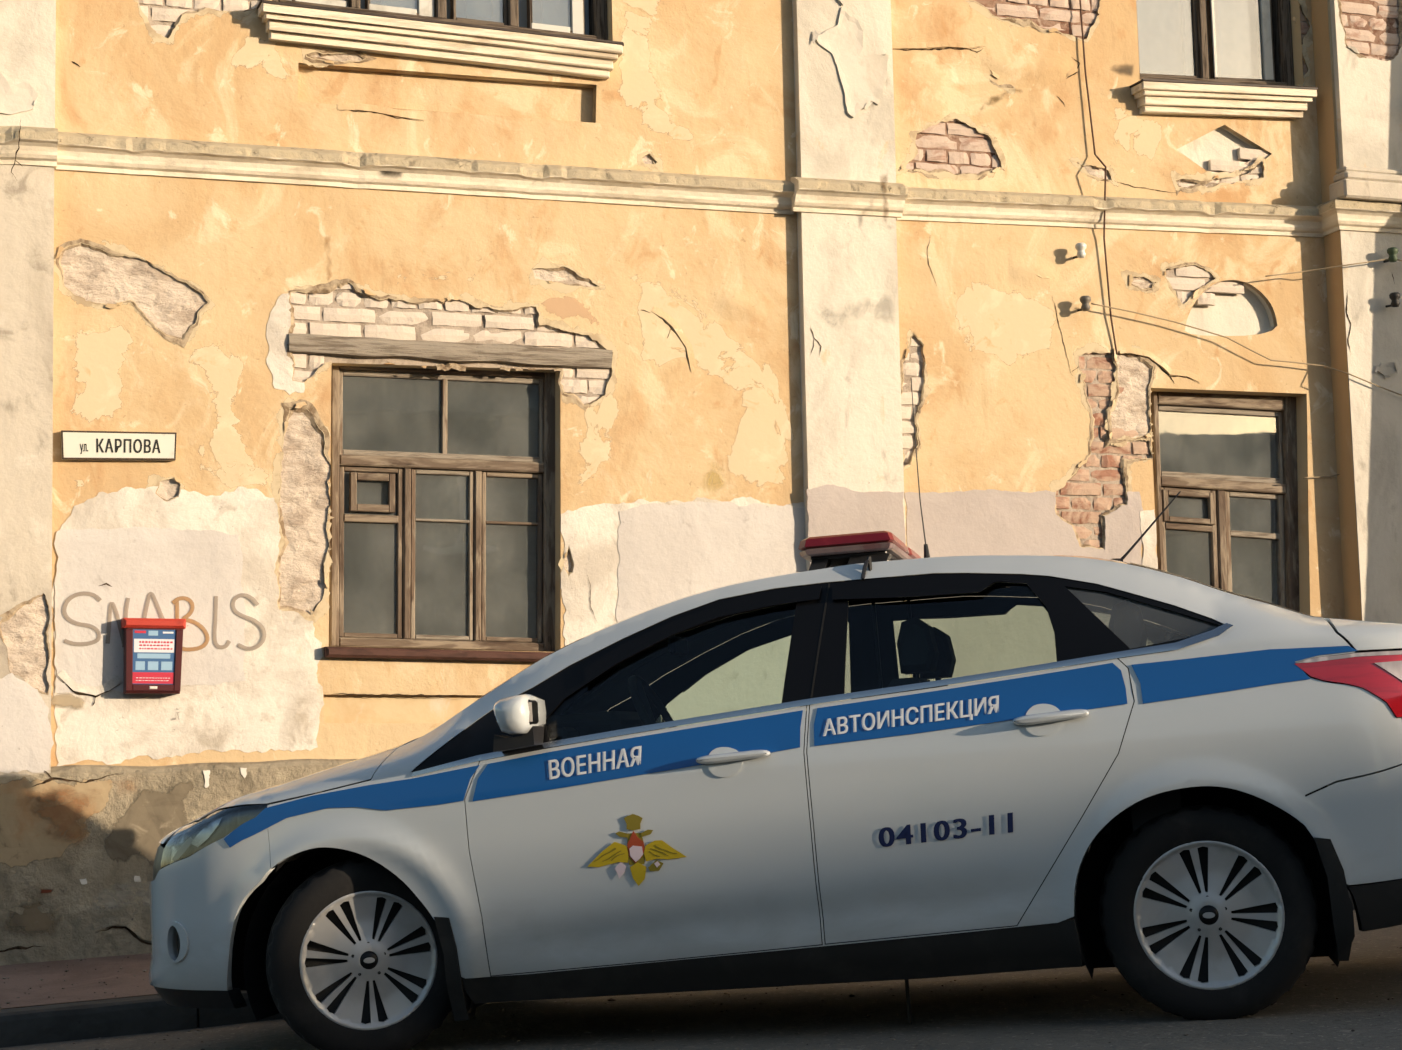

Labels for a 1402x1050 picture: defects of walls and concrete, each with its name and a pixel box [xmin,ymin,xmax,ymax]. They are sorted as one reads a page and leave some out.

flaking render [134,0,260,45]
peeling [231,36,289,79]
spalling [301,47,377,68]
flaking render [965,0,1101,43]
flaking render [1338,0,1402,61]
flaking render [896,113,1005,181]
flaking render [1170,147,1270,196]
spalling [54,238,255,481]
flaking render [900,330,931,471]
flaking render [271,256,619,624]
flaking render [1049,342,1159,550]
spalling [0,593,53,695]